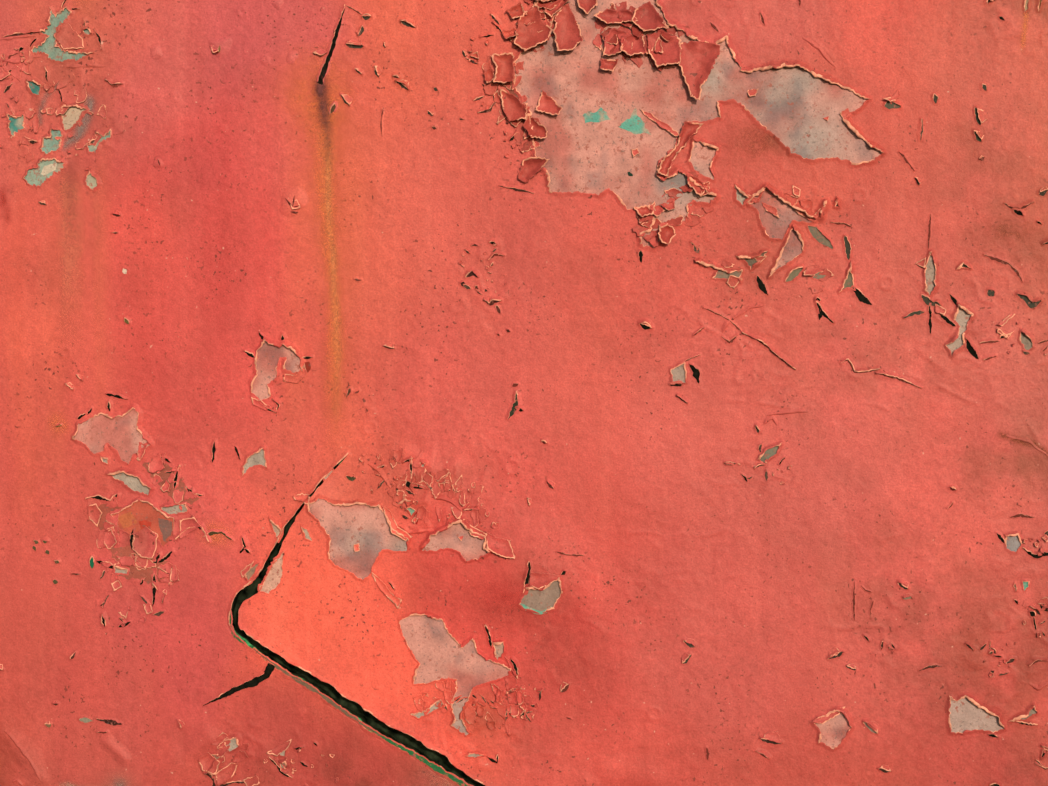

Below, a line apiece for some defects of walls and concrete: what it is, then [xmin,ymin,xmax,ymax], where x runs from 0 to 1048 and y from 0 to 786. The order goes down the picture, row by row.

peeling [0,0,125,207]
rust [311,81,341,377]
crack [313,2,363,85]
peeling [458,0,922,315]
peeling [901,213,1048,363]
peeling [32,391,213,630]
crack [209,438,218,465]
peeling [240,515,287,595]
crack [196,450,494,786]
peeling [292,447,569,738]
crack [555,550,586,558]
peeling [944,692,1041,739]